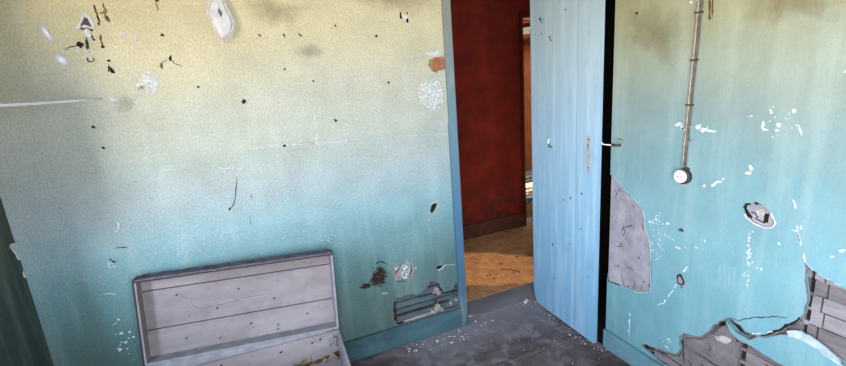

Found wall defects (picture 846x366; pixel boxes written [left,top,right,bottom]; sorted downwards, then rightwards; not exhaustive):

spalling [57,2,110,64]
spalling [387,49,445,117]
peeling [675,122,717,133]
flaking render [607,174,706,293]
spalling [744,202,776,228]
flaking render [360,260,459,326]
flaking render [641,262,846,366]